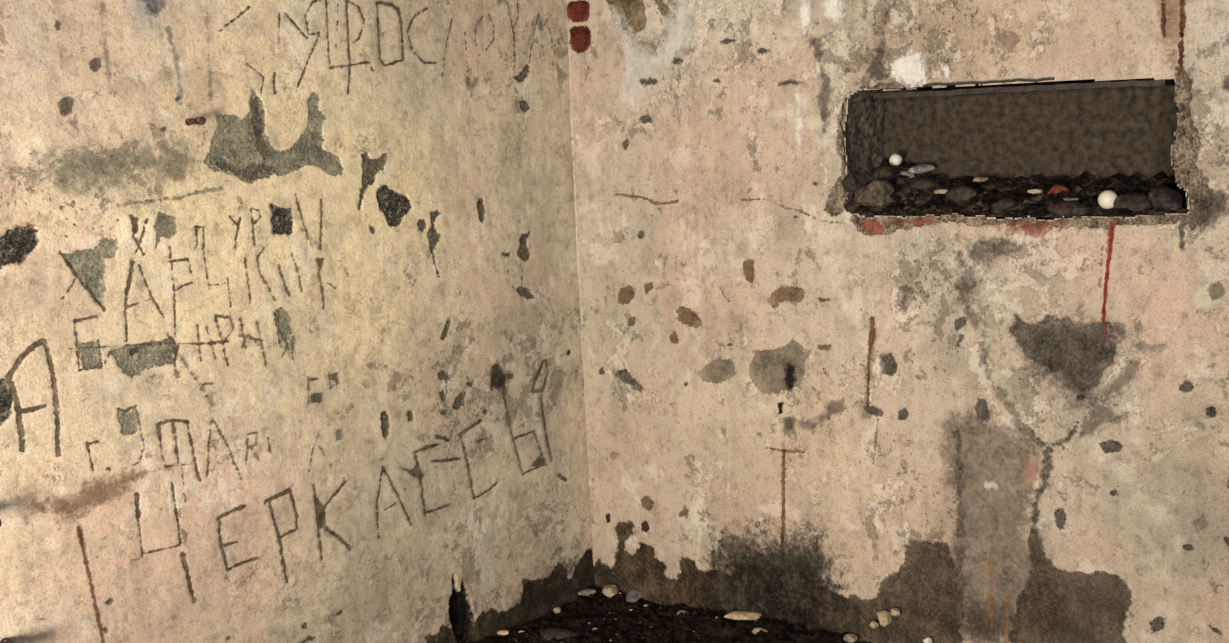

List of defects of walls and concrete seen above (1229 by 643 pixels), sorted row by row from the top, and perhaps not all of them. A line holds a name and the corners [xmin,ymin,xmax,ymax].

corrosion [1161,0,1186,75]
flaking render [89,57,100,72]
peeling [35,89,343,189]
peeling [117,186,223,206]
spalling [270,203,293,235]
flaking render [358,152,441,277]
flaking render [0,223,39,269]
flaking render [0,379,13,426]
water stain [425,407,1131,643]